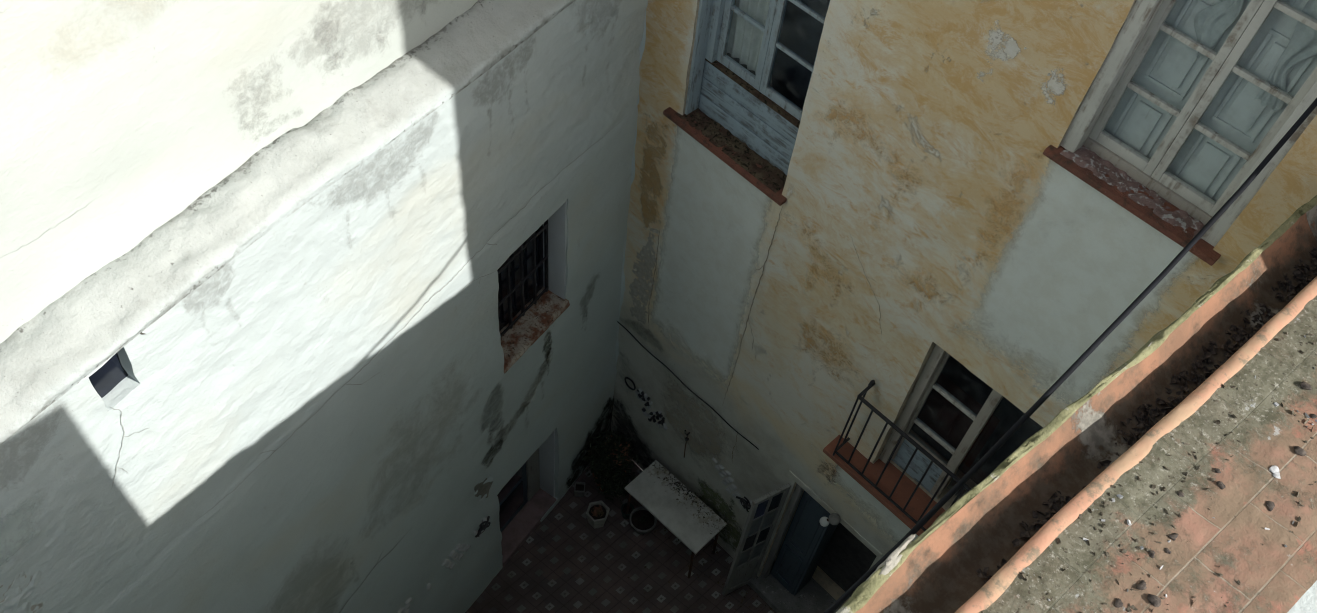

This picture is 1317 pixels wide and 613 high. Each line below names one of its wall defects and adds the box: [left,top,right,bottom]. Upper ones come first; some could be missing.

peeling [1041,68,1067,103]
crack [723,206,783,462]